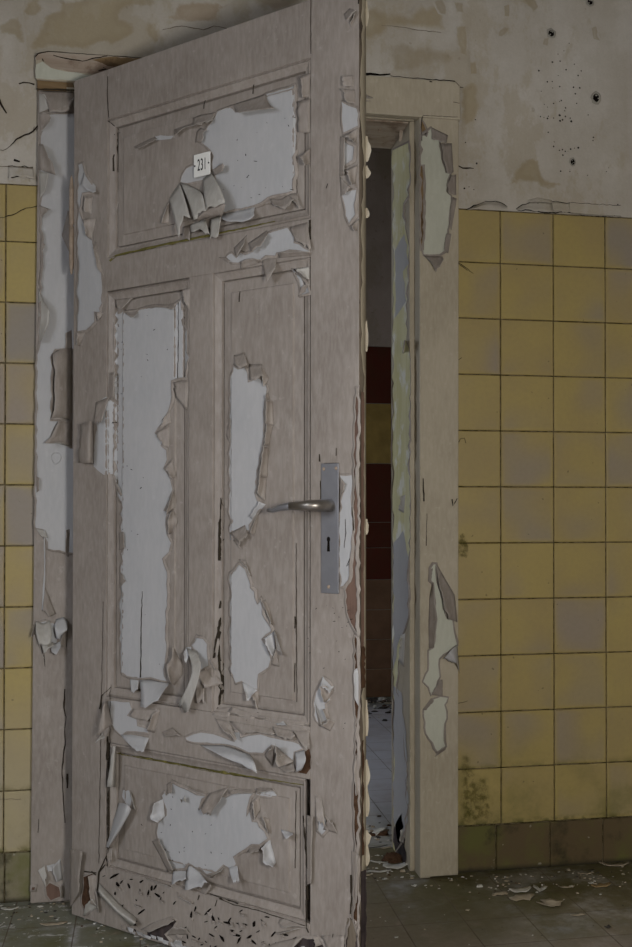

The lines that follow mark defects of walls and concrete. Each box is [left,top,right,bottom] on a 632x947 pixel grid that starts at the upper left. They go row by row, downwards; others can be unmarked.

crack [0,125,38,169]
crack [35,51,140,171]
peeling [340,75,373,231]
peeling [8,62,335,861]
peeling [262,118,621,947]
peeling [146,780,293,890]
peeling [30,849,186,947]